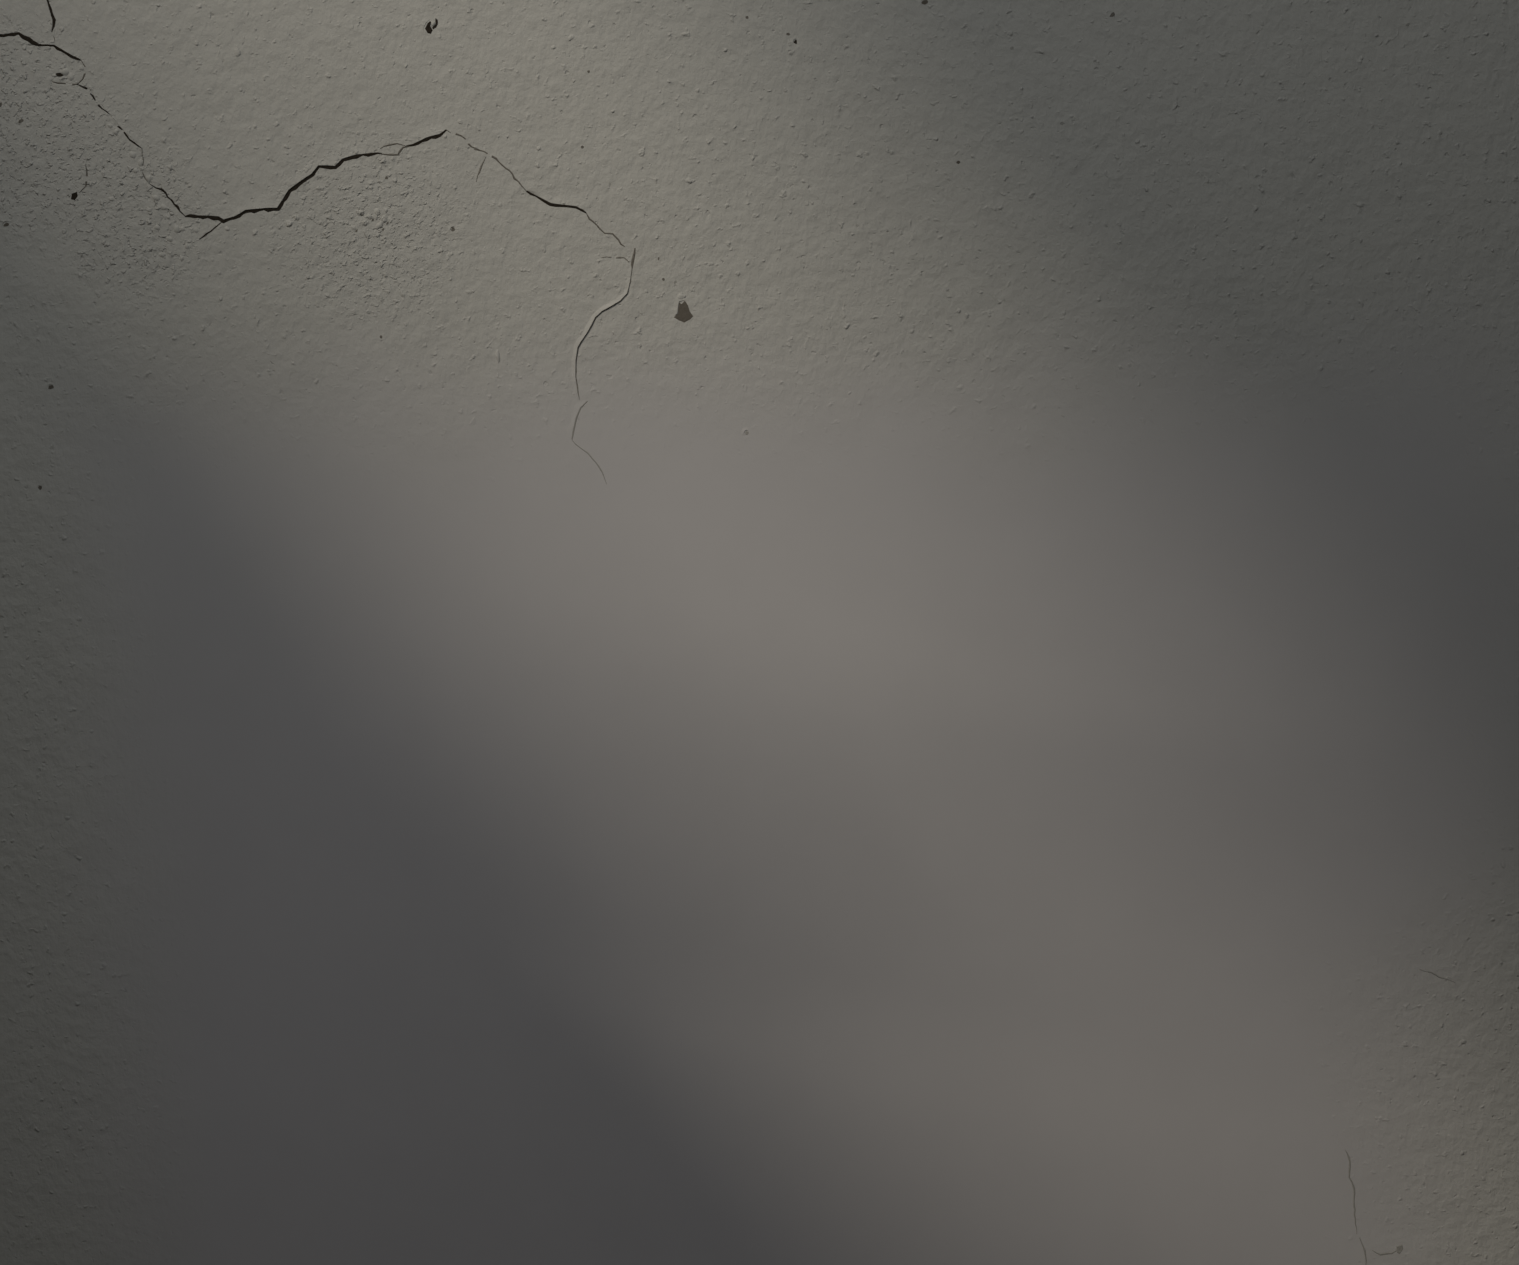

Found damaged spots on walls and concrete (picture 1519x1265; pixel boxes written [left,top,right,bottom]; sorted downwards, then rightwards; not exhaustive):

crack [0,0,636,484]